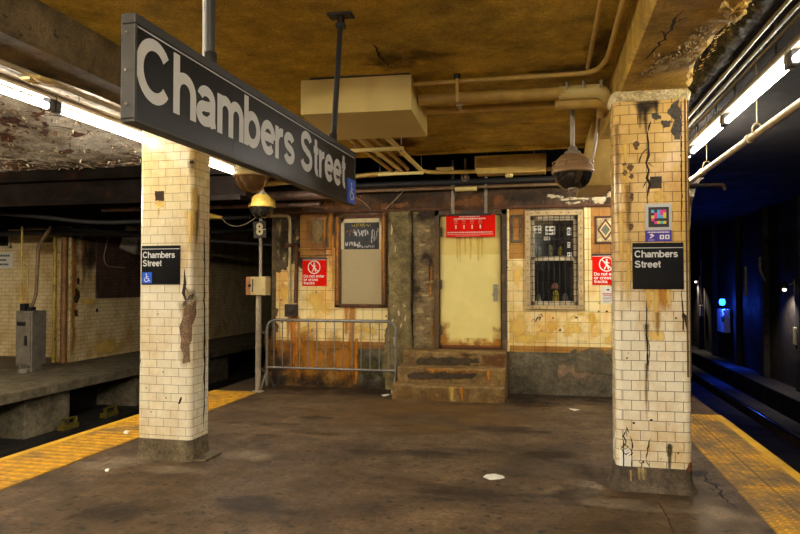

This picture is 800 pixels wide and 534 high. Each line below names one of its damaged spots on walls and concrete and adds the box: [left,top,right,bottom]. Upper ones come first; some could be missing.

crack [642,10,687,61]
peeling [642,0,753,84]
peeling [0,98,142,172]
damp [637,100,658,129]
spalling [651,99,682,140]
crack [638,121,652,204]
peeling [547,191,611,205]
spalling [173,294,197,363]
corrosion [275,307,358,385]
corrosion [456,328,504,381]
corrosion [645,289,669,342]
crack [693,472,736,507]